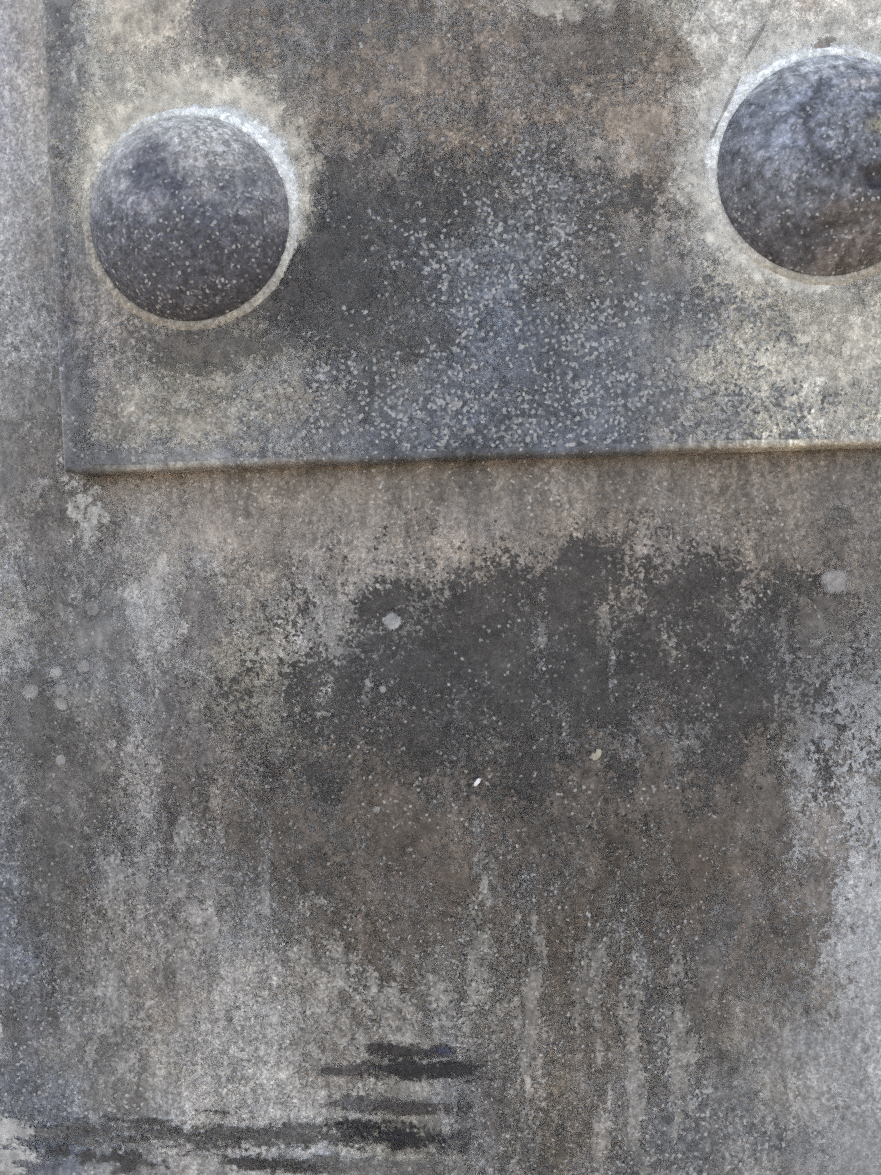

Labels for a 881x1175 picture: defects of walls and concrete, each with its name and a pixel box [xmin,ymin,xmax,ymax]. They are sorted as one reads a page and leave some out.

leakage [0,314,881,1175]